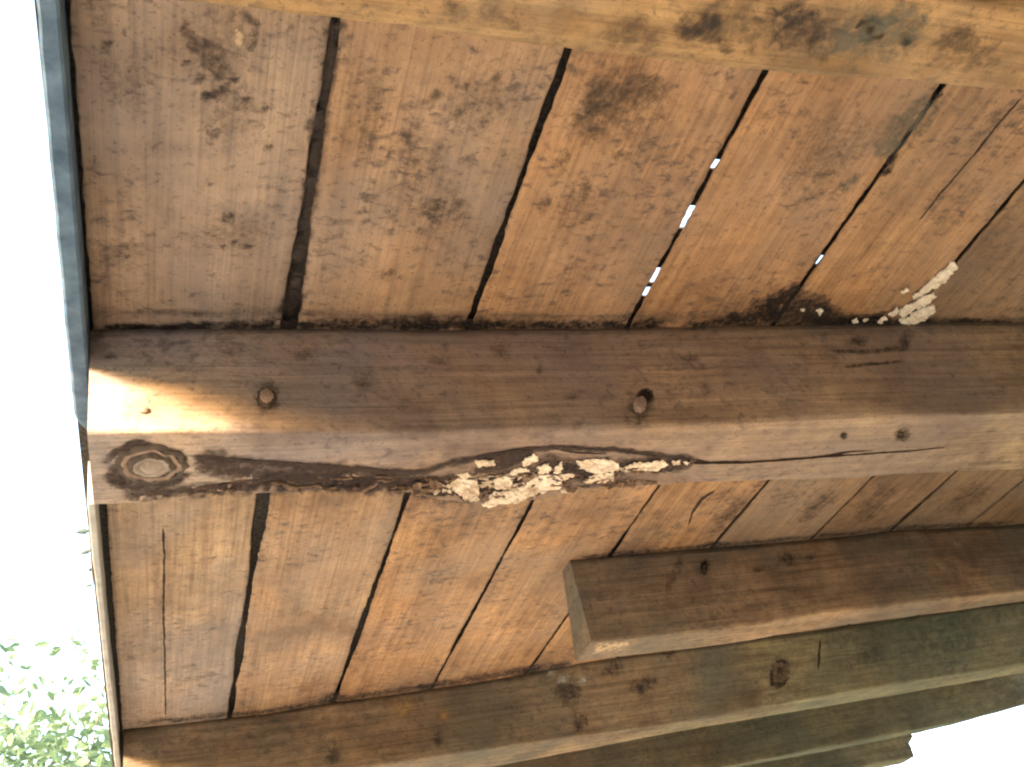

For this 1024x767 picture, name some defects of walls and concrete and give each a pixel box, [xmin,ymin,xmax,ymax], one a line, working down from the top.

water stain [677,14,729,52]
water stain [773,4,926,64]
water stain [105,23,662,331]
crack [919,99,1020,220]
water stain [687,284,910,368]
crack [479,446,606,457]
peeling [450,453,690,502]
crack [632,447,944,464]
crack [160,530,168,715]